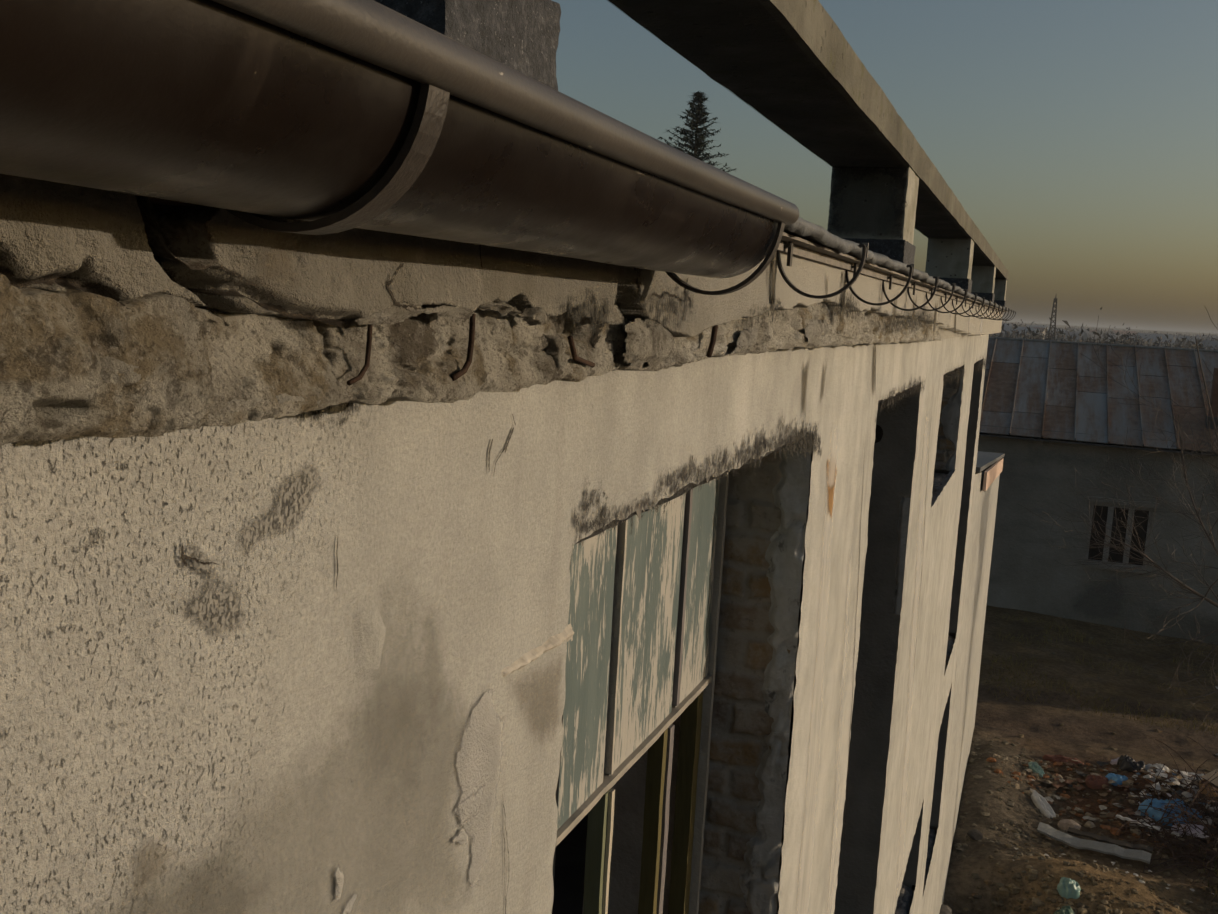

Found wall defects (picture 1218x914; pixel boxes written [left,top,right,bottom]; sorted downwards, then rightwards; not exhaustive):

spalling [136,195,220,270]
crack [0,257,134,312]
crack [162,265,345,327]
crack [387,263,421,310]
spalling [0,273,941,447]
crack [488,414,516,476]
flaking render [572,419,822,914]
flaking render [335,867,357,914]